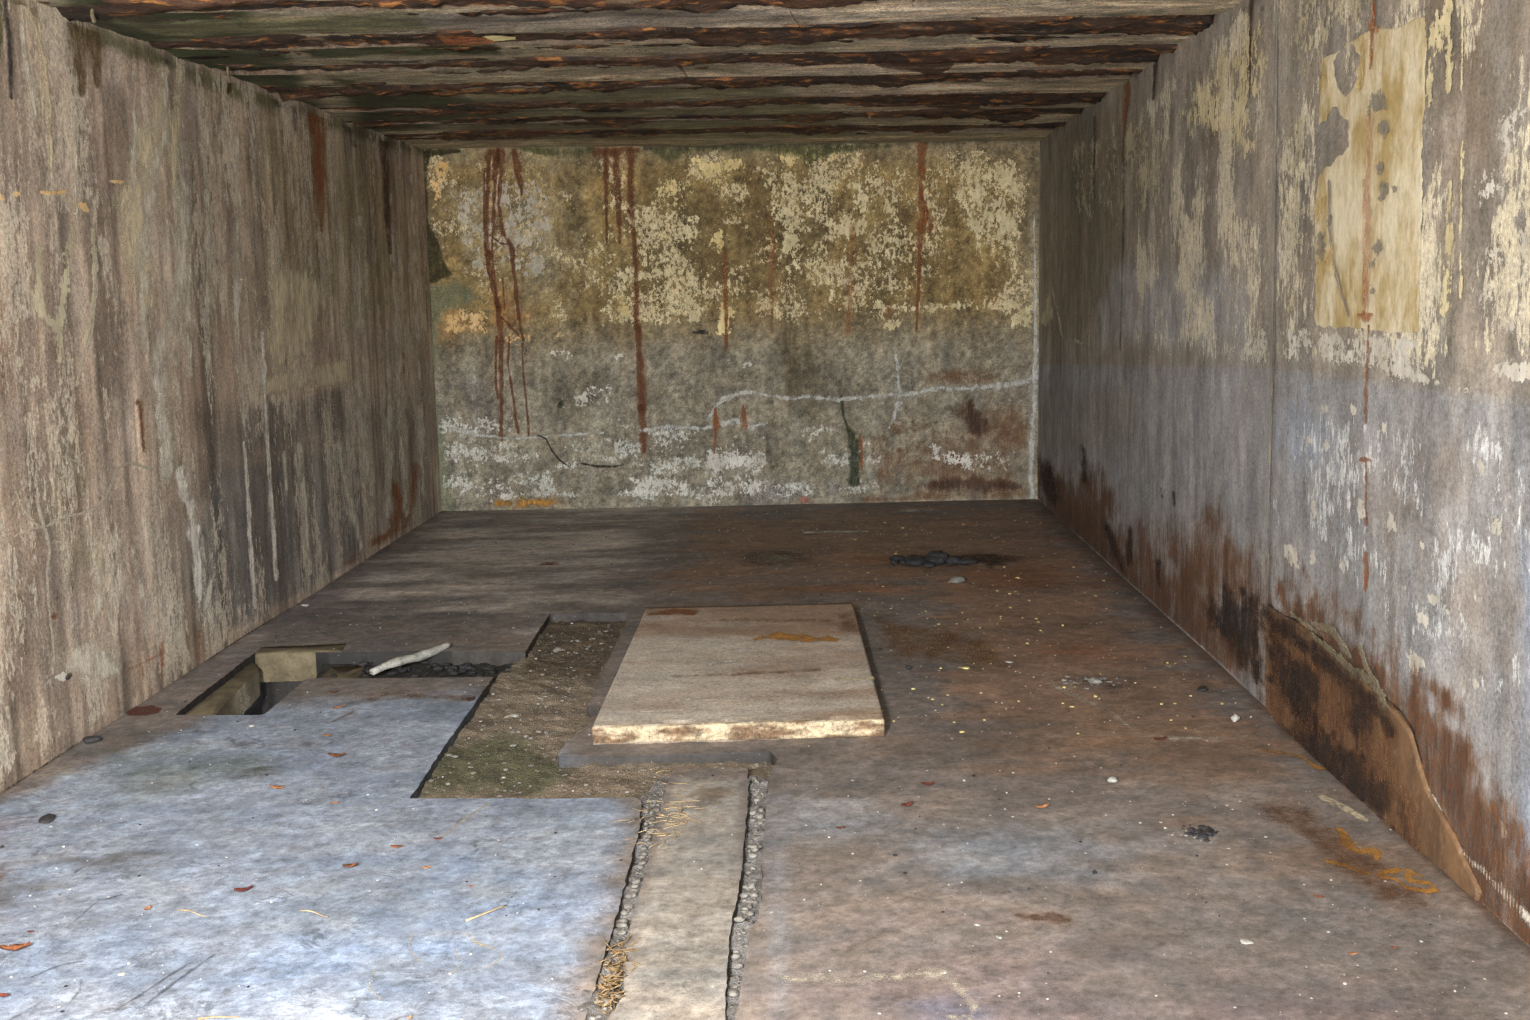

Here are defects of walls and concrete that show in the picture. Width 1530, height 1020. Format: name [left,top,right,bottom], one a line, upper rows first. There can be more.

corrosion [904,93,980,115]
peeling [1424,0,1465,117]
corrosion [483,148,530,440]
corrosion [590,146,647,453]
peeling [593,148,1087,348]
damp [644,218,1039,498]
corrosion [915,142,933,332]
peeling [1226,105,1469,393]
peeling [1439,81,1530,338]
damp [494,498,555,508]
damp [1317,795,1440,894]
damp [1461,847,1530,926]